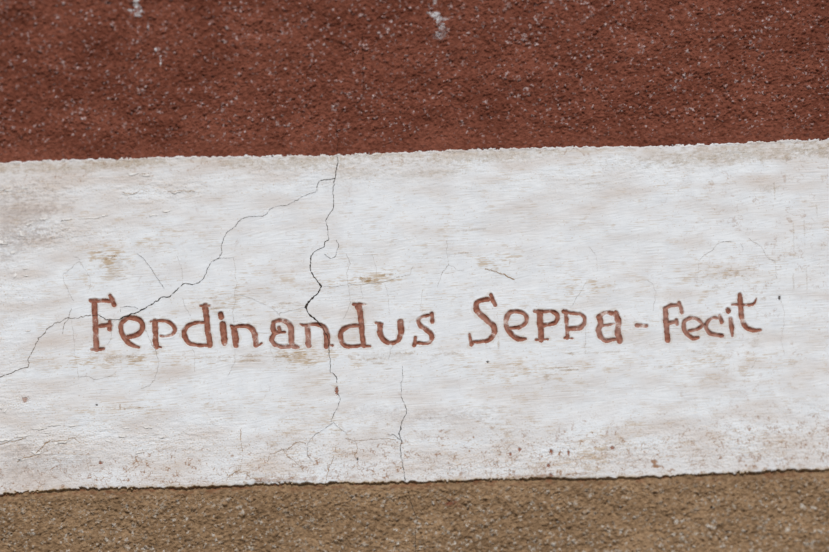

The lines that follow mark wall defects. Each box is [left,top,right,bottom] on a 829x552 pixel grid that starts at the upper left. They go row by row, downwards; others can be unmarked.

crack [0,33,418,552]